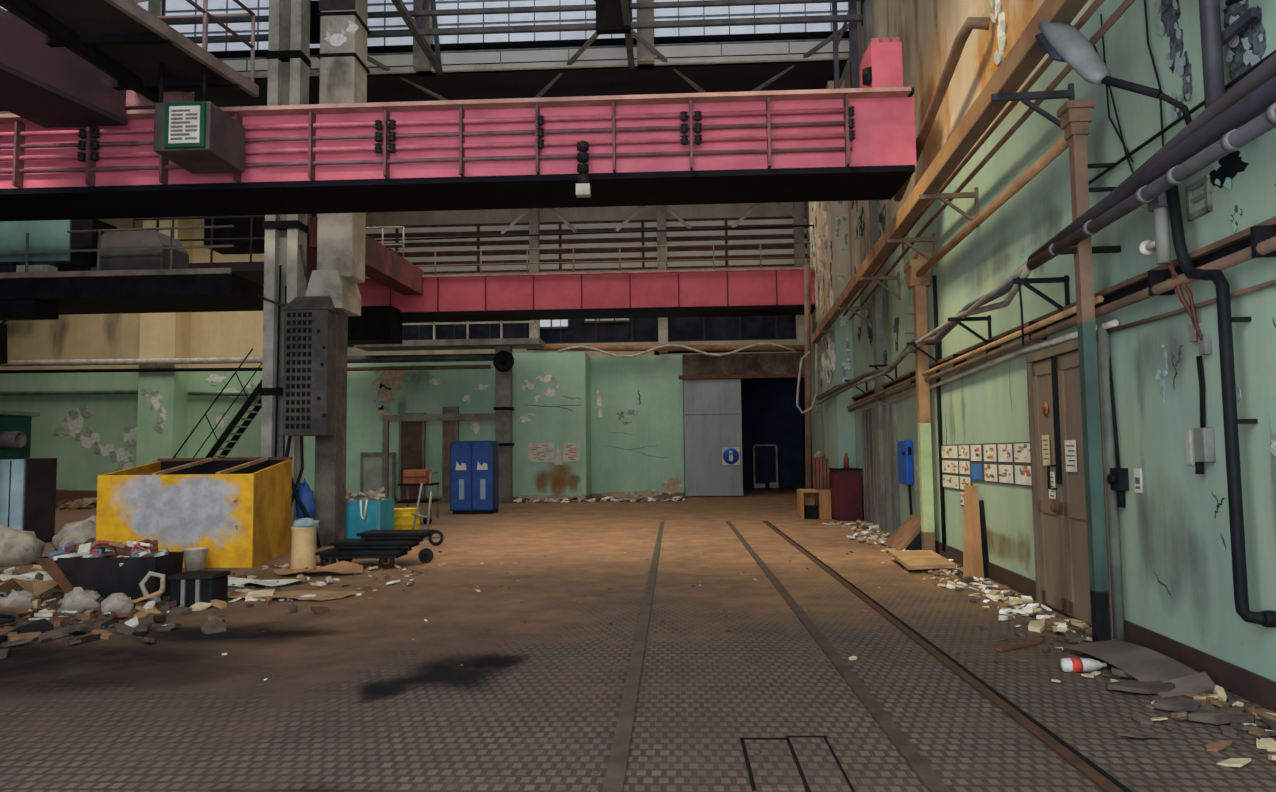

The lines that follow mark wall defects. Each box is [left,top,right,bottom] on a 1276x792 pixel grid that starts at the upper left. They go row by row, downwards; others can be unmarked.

spalling [1154,0,1193,122]
spalling [1219,0,1267,93]
peeling [140,386,168,432]
peeling [371,370,410,419]
peeling [518,373,559,423]
peeling [53,404,137,471]
crack [1212,493,1226,548]